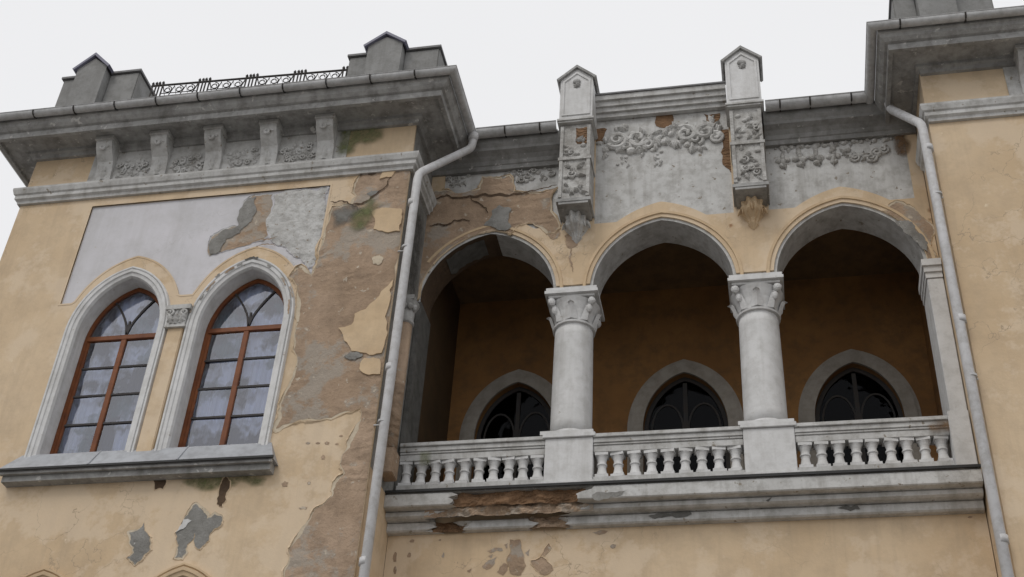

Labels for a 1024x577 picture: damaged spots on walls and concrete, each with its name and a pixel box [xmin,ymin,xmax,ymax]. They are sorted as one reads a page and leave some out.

damp [339,128,381,153]
flaking render [655,115,674,128]
crack [432,185,555,226]
spalling [418,174,579,321]
spalling [882,200,938,259]
spalling [190,171,410,577]
peeling [173,477,232,561]
peeling [126,523,153,567]
peeling [467,539,554,576]